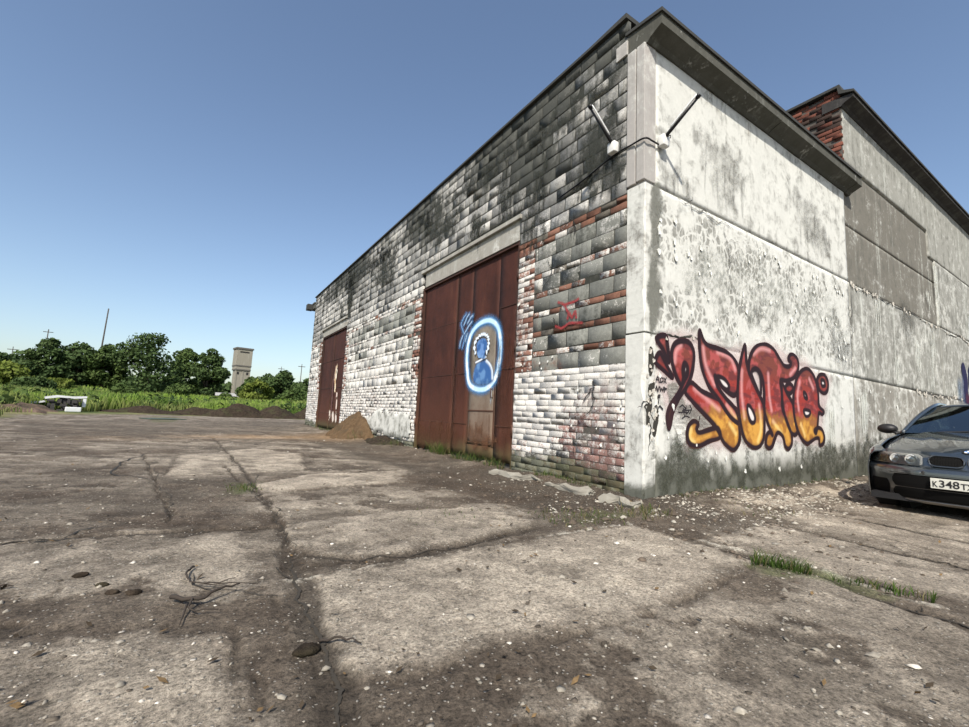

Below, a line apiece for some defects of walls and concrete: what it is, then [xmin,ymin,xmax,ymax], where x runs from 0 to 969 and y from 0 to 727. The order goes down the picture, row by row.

mould [319,66,626,319]
peeling [646,182,711,447]
peeling [673,238,878,361]
crack [0,526,103,550]
crack [110,454,177,536]
crack [192,443,526,727]
leakage [653,391,882,495]